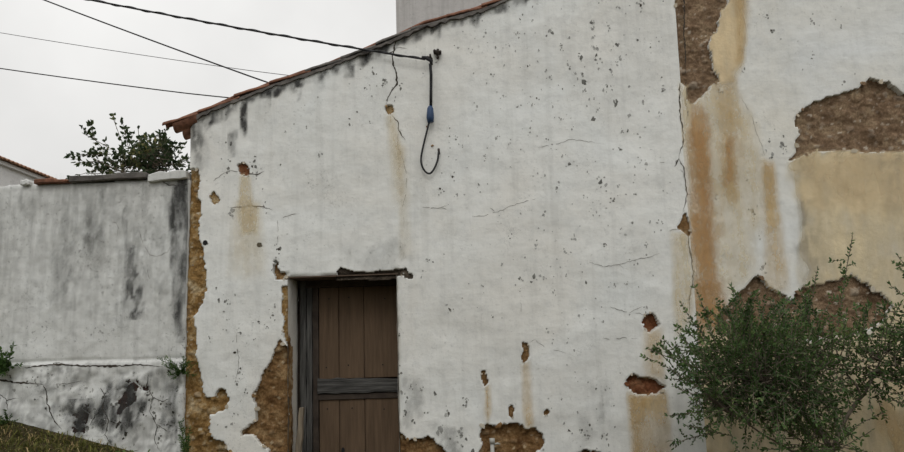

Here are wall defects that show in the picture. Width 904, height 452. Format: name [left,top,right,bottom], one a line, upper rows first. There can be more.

spalling [663,0,745,104]
crack [662,0,695,311]
damp [170,179,188,232]
spalling [677,210,692,237]
damp [127,273,142,299]
spalling [26,168,299,452]
spalling [642,306,658,332]
peeling [700,73,904,452]
crack [0,362,168,448]
damp [68,384,146,433]
spalling [400,405,544,452]
spalling [620,373,665,404]